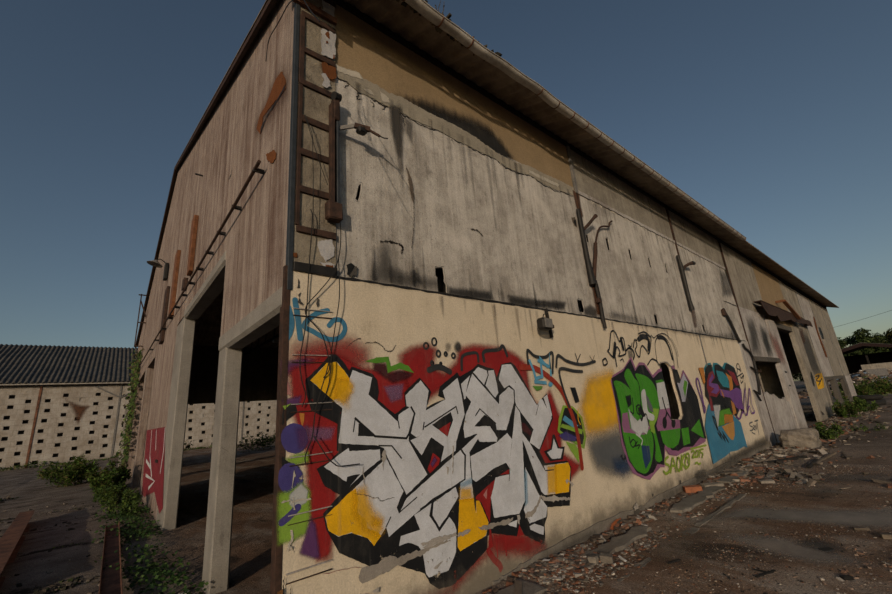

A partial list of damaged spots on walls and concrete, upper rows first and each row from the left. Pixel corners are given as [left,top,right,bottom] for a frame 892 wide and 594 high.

spalling [321,28,574,196]
water stain [390,97,511,165]
crack [338,78,571,196]
peeling [317,239,335,267]
water stain [449,288,491,299]
water stain [509,296,565,309]
water stain [750,324,771,353]